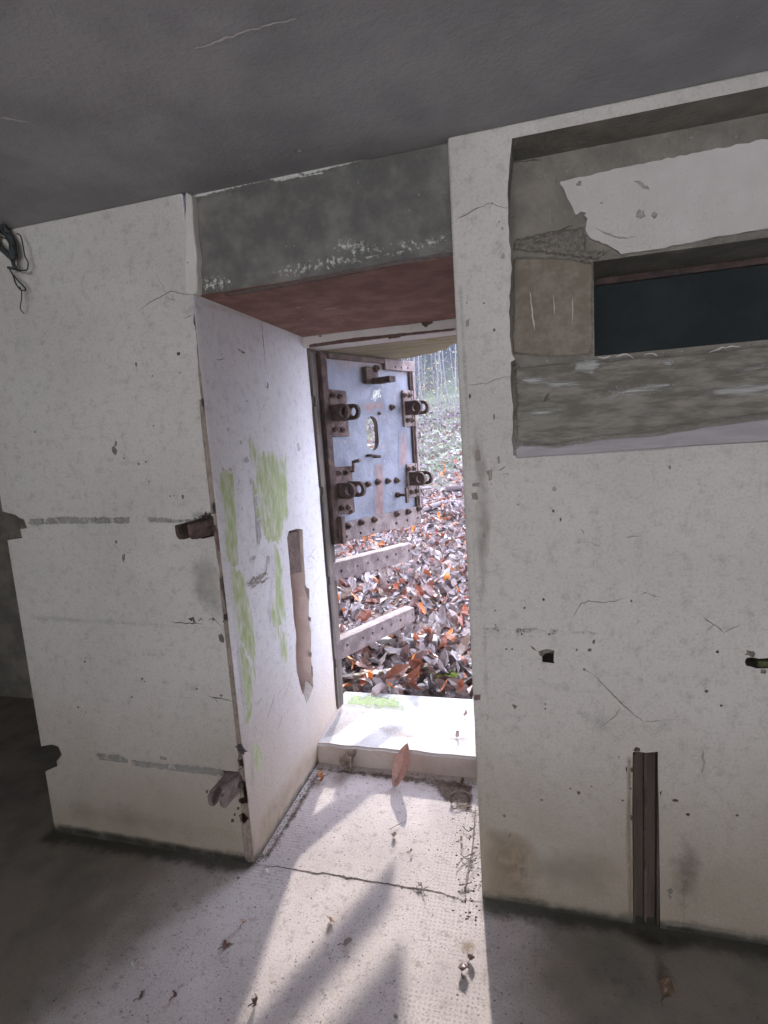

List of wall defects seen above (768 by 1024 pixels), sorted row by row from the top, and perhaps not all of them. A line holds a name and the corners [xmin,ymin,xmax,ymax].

leakage [268,230,453,280]
leakage [202,273,236,294]
crack [140,281,198,343]
corrosion [398,428,409,470]
corrosion [373,462,385,516]
crack [574,592,662,616]
spalling [304,651,313,704]
crack [585,670,662,726]
crack [250,863,481,902]